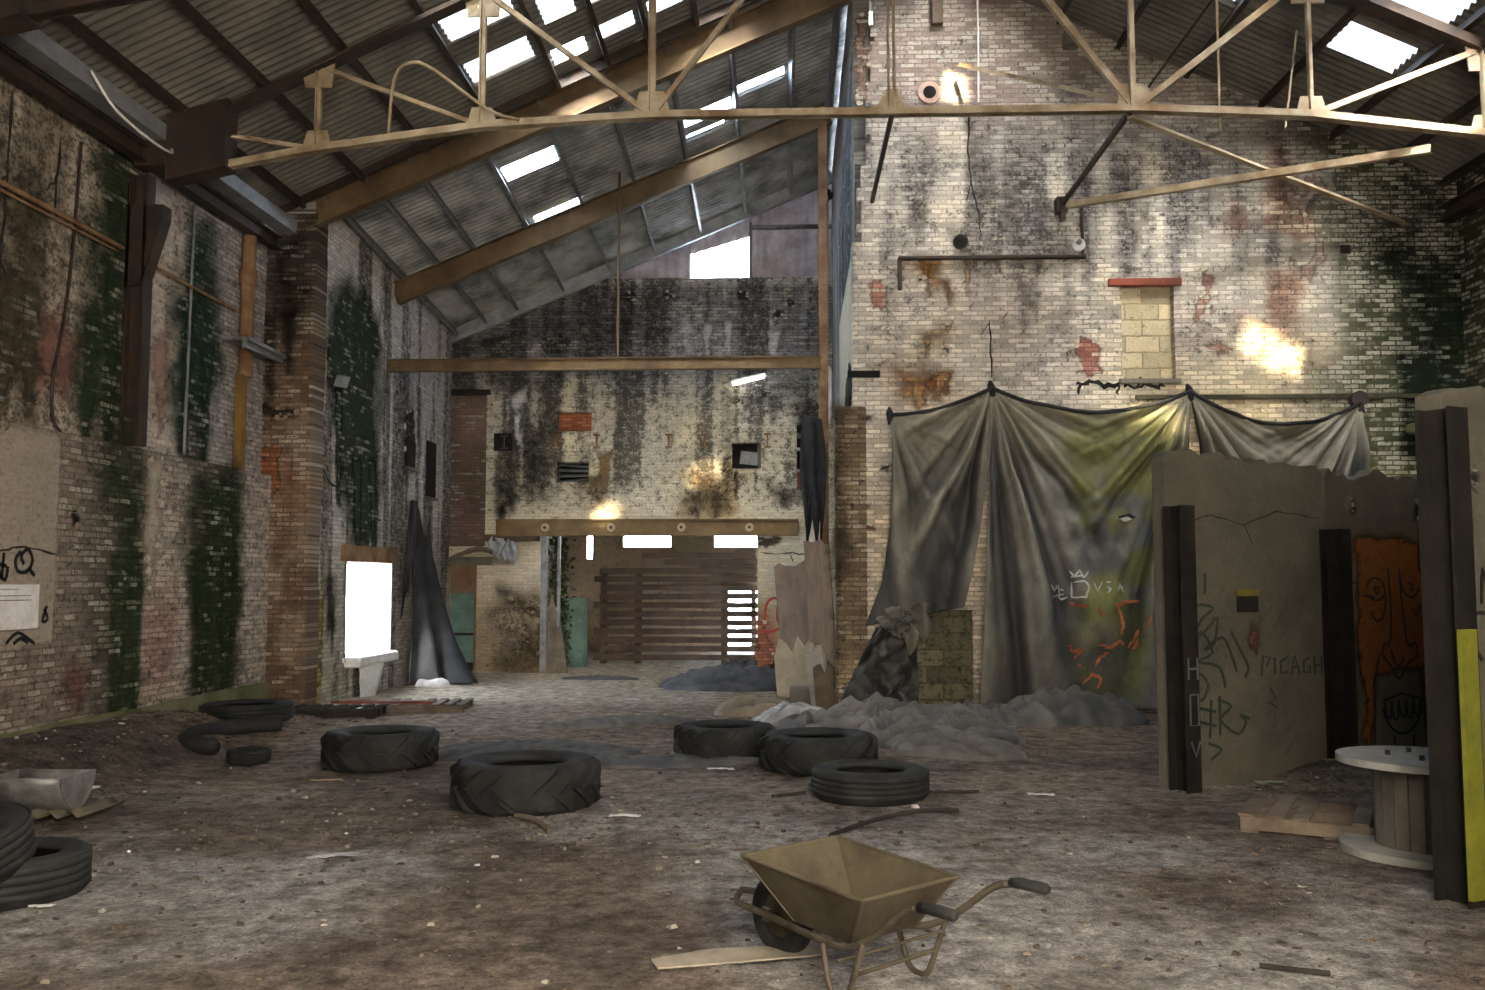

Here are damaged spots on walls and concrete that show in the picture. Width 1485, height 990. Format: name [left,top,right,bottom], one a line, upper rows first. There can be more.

leakage [0,174,46,417]
corrosion [917,260,969,304]
leakage [61,269,122,442]
leakage [679,314,732,355]
leakage [767,331,780,355]
corrosion [894,328,951,409]
peeling [1074,337,1106,377]
leakage [489,339,546,519]
leakage [684,458,801,517]